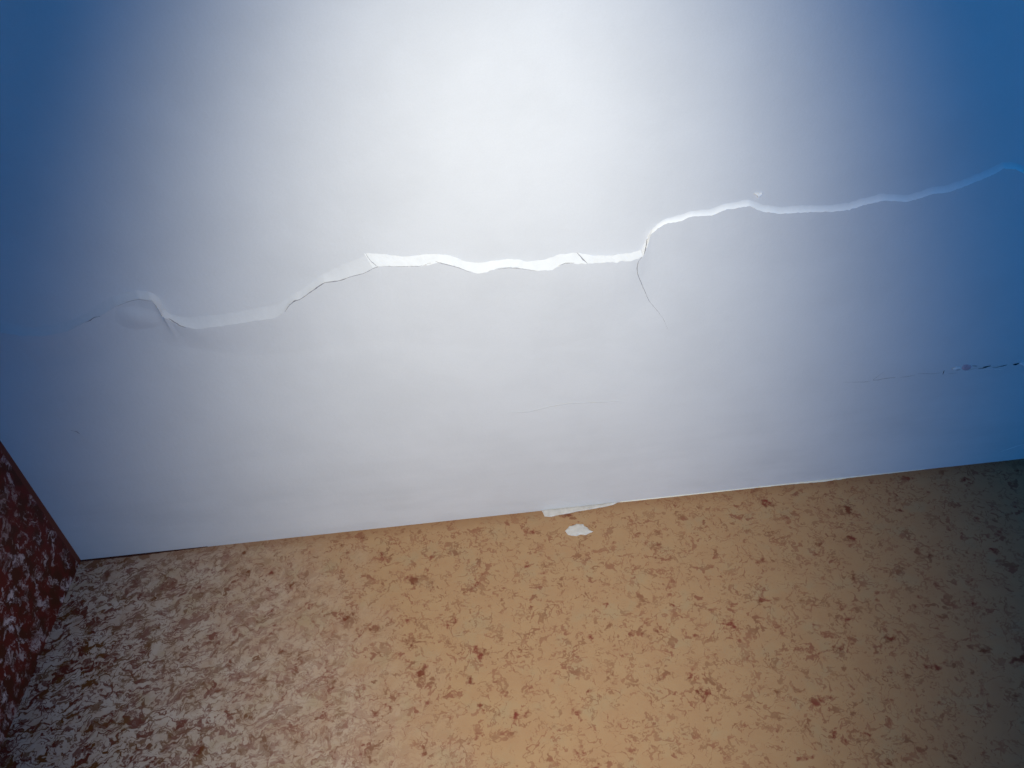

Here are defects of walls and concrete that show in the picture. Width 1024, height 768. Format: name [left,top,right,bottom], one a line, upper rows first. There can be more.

crack [0,162,1024,362]
crack [867,361,1024,382]